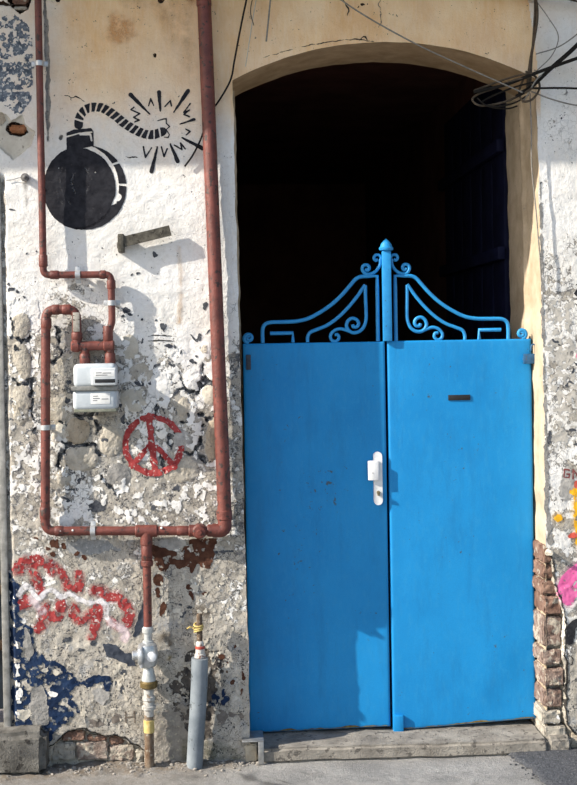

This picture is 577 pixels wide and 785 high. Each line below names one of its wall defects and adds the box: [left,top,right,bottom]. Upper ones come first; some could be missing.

peeling [0,0,35,160]
peeling [7,282,41,382]
peeling [121,330,210,428]
peeling [11,434,41,510]
peeling [53,460,218,526]
peeling [155,537,186,550]
spalling [532,182,577,748]
peeling [8,572,145,767]
spalling [153,574,246,762]
crack [550,556,577,735]